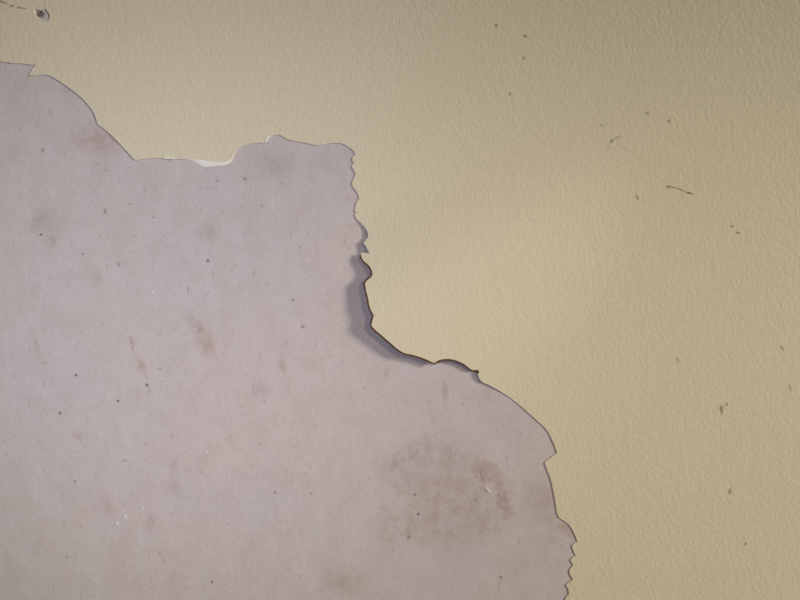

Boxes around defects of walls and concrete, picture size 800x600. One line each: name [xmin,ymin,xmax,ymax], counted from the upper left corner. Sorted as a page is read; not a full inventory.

peeling [33,8,51,22]
peeling [0,62,644,600]